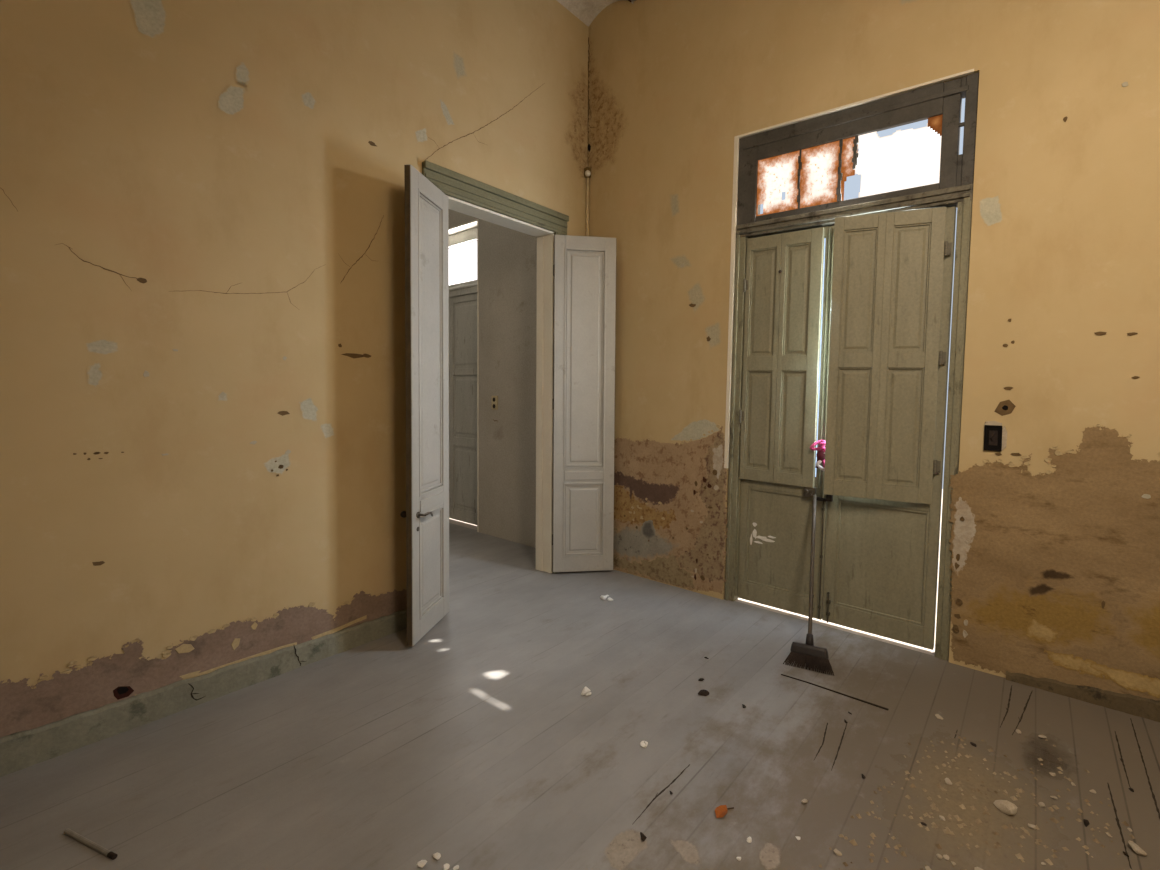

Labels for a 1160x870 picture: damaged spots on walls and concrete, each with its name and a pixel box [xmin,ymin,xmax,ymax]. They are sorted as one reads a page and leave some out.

crack [424,83,545,161]
crack [56,243,138,290]
crack [188,215,384,308]
peeling [614,418,729,594]
peeling [948,424,1160,700]
peeling [0,589,407,738]
water stain [951,576,1160,698]